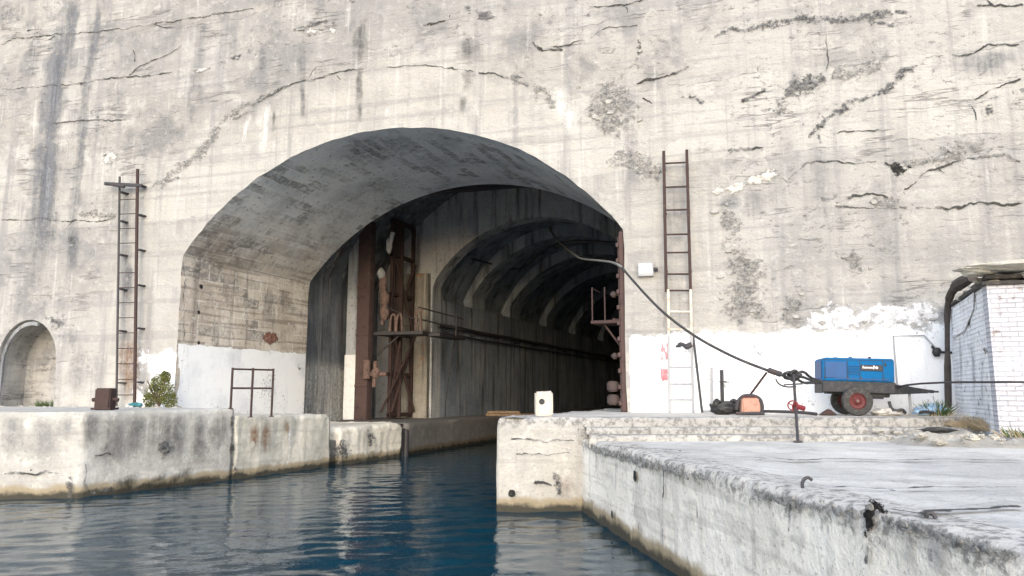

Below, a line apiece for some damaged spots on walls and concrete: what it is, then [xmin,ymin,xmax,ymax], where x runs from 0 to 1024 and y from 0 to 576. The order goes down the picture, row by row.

damp [84,13,100,89]
crack [1,8,254,90]
crack [926,43,1019,58]
crack [259,69,360,102]
crack [389,64,525,85]
crack [971,78,1021,120]
damp [32,7,78,238]
crack [837,127,888,135]
crack [782,160,876,182]
crack [836,153,1022,212]
peeling [782,293,944,331]
crack [511,438,574,456]